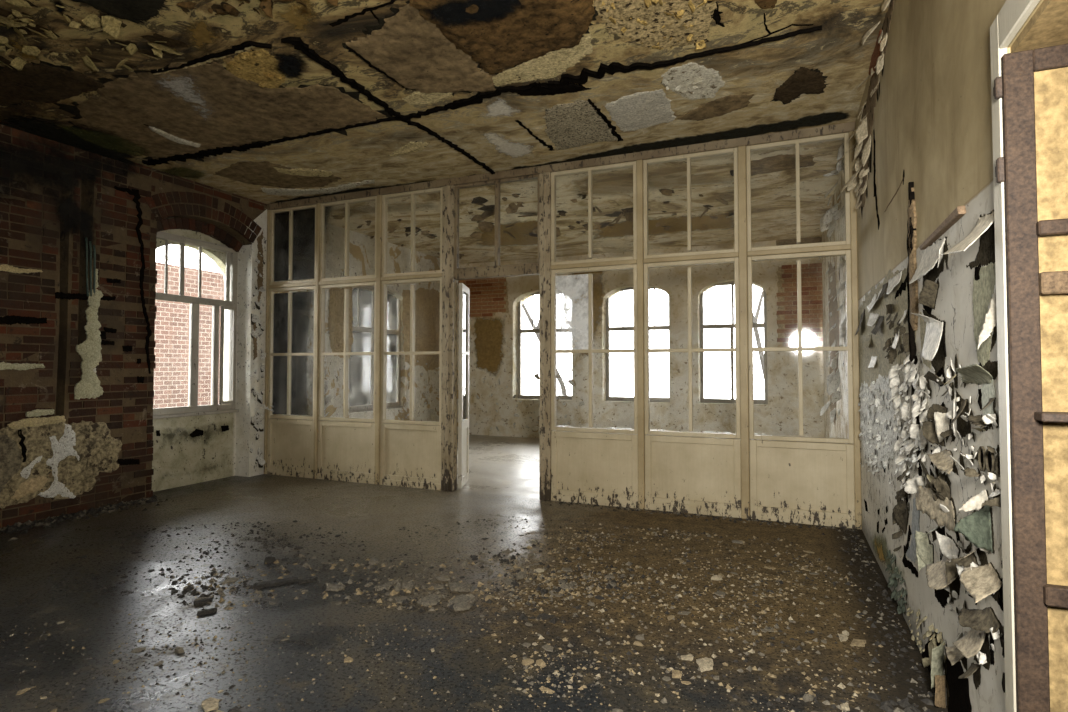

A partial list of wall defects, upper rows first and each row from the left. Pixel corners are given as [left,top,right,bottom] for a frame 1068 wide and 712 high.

peeling [593,0,717,50]
spalling [754,0,777,9]
peeling [224,49,285,89]
crack [142,0,822,175]
spalling [492,32,593,87]
spalling [661,62,754,121]
peeling [770,0,894,246]
spalling [751,154,816,176]
crack [114,186,152,374]
spalling [776,209,1005,712]